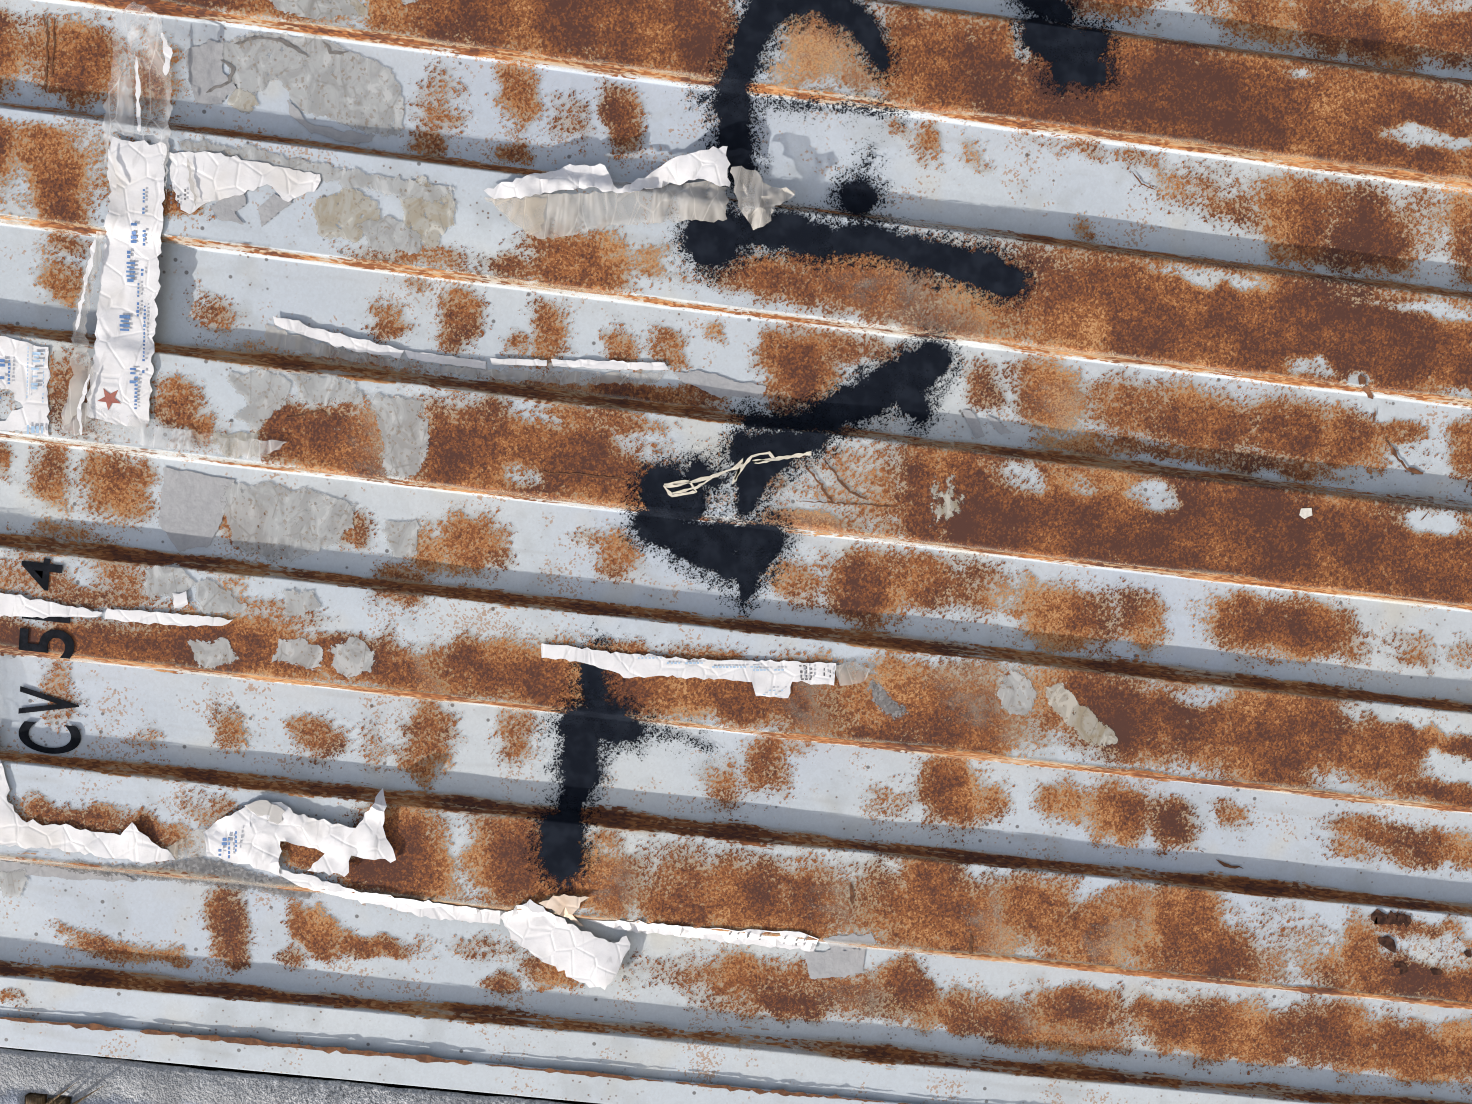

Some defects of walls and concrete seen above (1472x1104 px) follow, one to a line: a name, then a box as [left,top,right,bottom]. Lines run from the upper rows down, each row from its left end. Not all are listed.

rust [0,0,745,319]
rust [361,296,420,345]
rust [598,321,695,372]
rust [145,370,232,459]
rust [567,519,648,589]
rust [279,841,324,875]
rust [1304,811,1472,876]
rust [0,852,259,976]
rust [272,886,441,973]
rust [445,930,584,1003]
rust [0,988,124,1031]
rust [140,1029,908,1104]